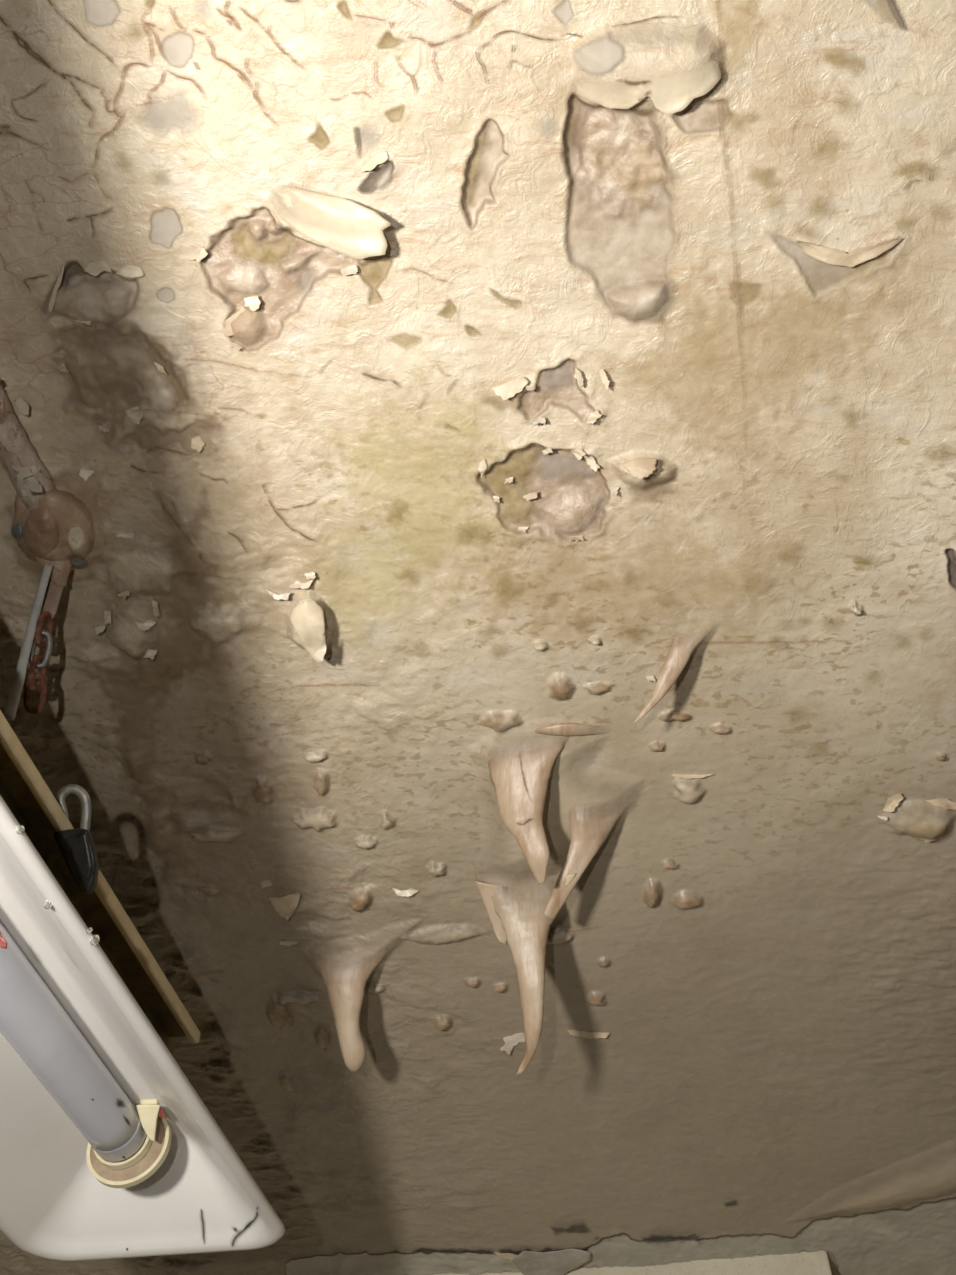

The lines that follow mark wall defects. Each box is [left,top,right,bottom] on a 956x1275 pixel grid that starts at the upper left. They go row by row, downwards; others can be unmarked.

crack [332,0,581,100]
crack [0,0,294,228]
spalling [674,100,731,134]
spalling [186,208,361,351]
spalling [463,120,509,228]
spalling [564,94,675,322]
peeling [798,238,903,268]
peeling [44,261,220,455]
spalling [491,359,602,425]
spalling [599,369,610,390]
spalling [478,444,619,541]
peeling [500,1033,525,1055]